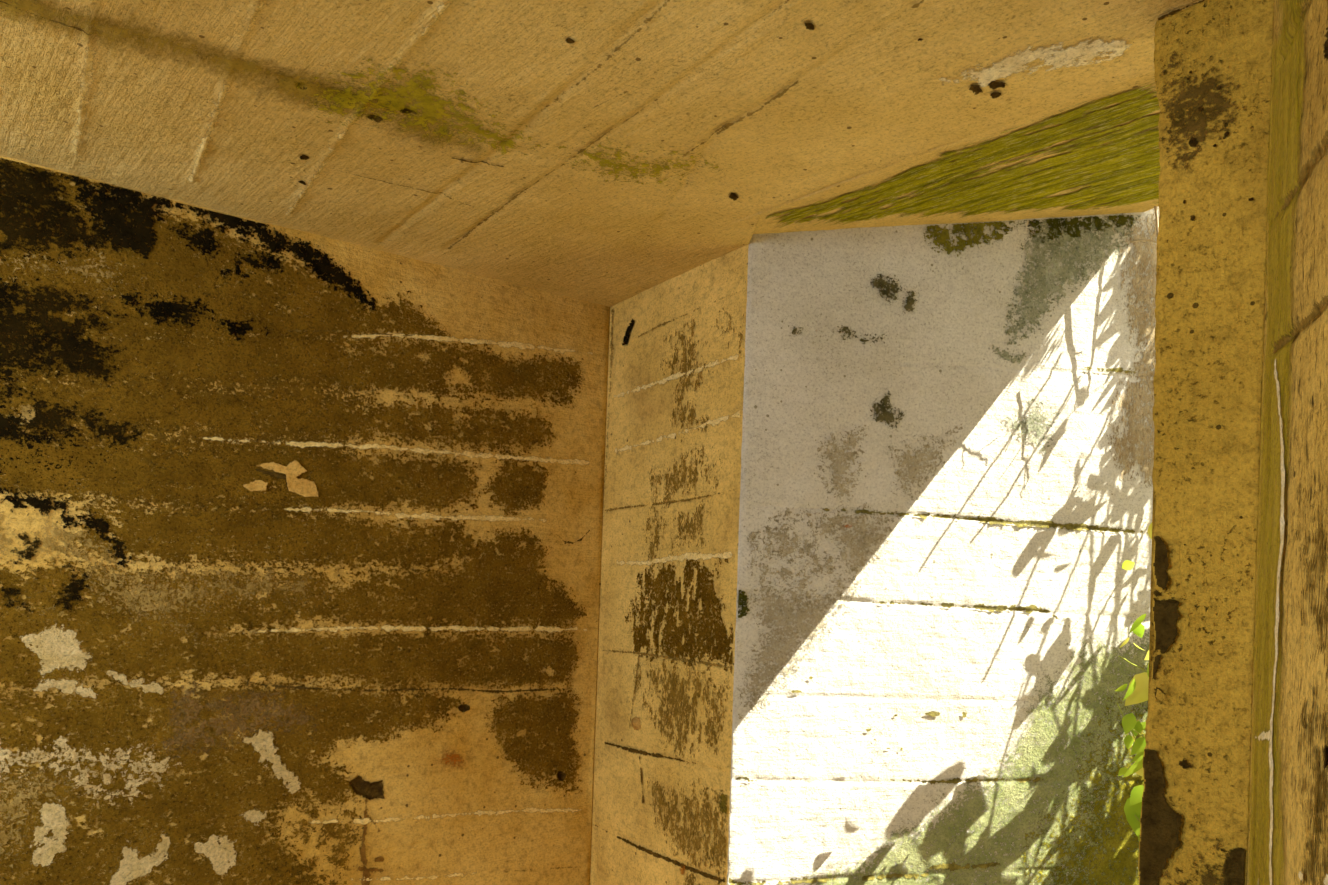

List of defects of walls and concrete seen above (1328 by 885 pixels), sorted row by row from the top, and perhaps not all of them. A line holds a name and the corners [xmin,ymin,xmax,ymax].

water stain [0,0,460,145]
water stain [0,159,377,699]
peeling [0,158,587,885]
spalling [1152,536,1180,704]
water stain [0,669,323,885]
spalling [1139,749,1182,885]
spalling [1220,847,1245,885]